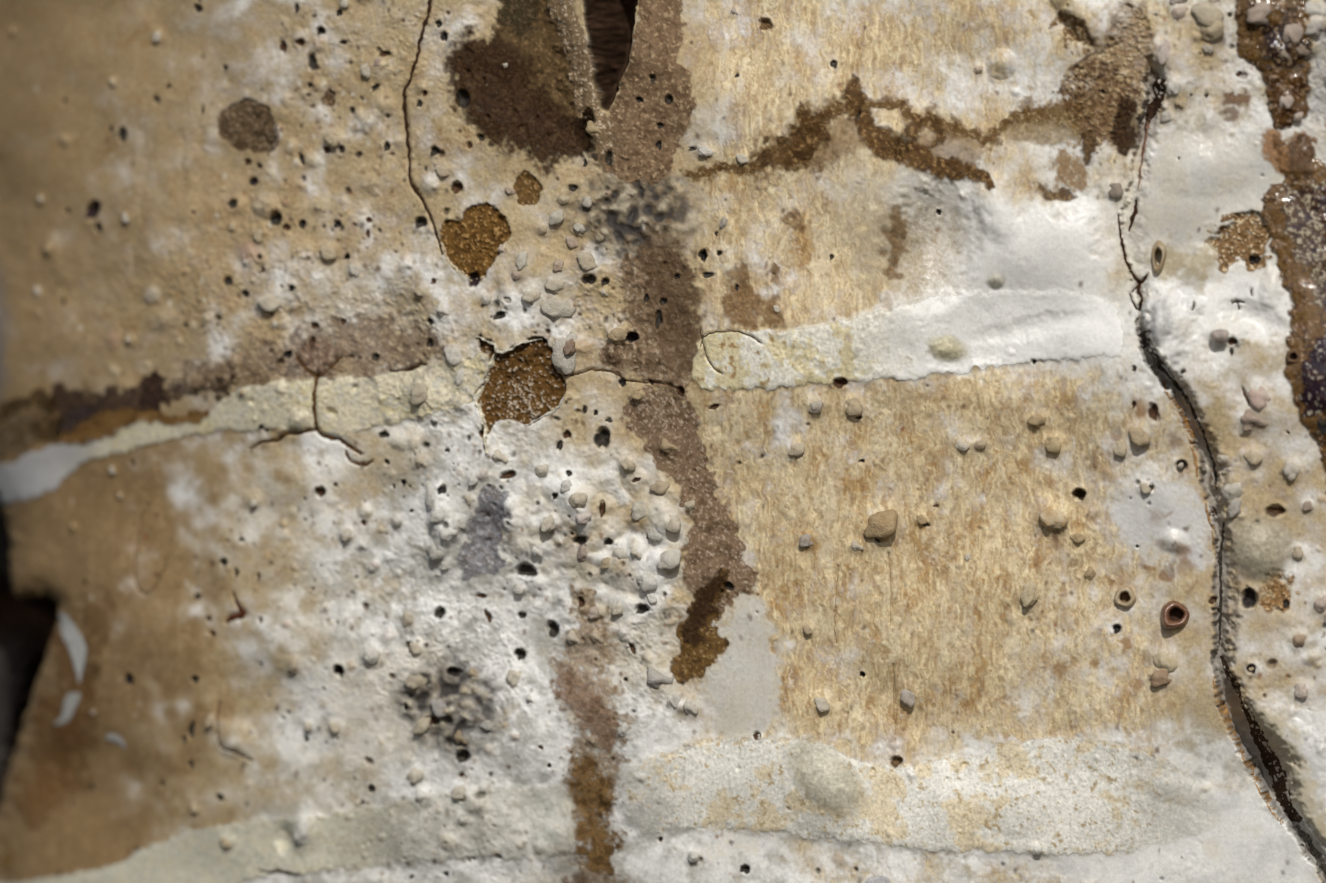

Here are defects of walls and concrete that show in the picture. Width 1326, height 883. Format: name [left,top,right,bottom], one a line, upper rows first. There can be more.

spalling [201,99,280,186]
crack [402,0,443,255]
spalling [514,170,543,205]
corrosion [446,0,1142,201]
corrosion [1223,89,1251,121]
corrosion [1262,129,1317,174]
spalling [416,203,511,286]
spalling [1205,211,1272,273]
crack [249,353,373,466]
spalling [474,335,566,453]
crack [1118,77,1326,875]
water stain [457,485,511,581]